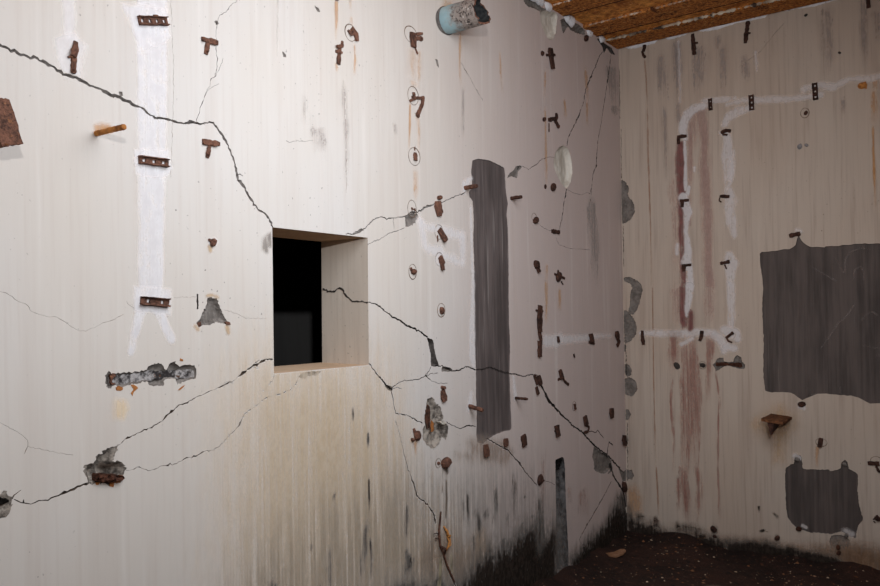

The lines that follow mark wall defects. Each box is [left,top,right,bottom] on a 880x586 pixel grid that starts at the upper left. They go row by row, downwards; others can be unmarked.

crack [0,0,273,228]
water stain [124,0,175,355]
water stain [676,77,880,309]
crack [12,483,92,504]
spalling [83,445,126,487]
spalling [105,358,196,396]
crack [119,358,299,471]
spalling [196,294,231,327]
spalling [422,397,448,449]
crack [323,287,629,545]
water stain [397,489,841,586]
water stain [640,326,740,354]